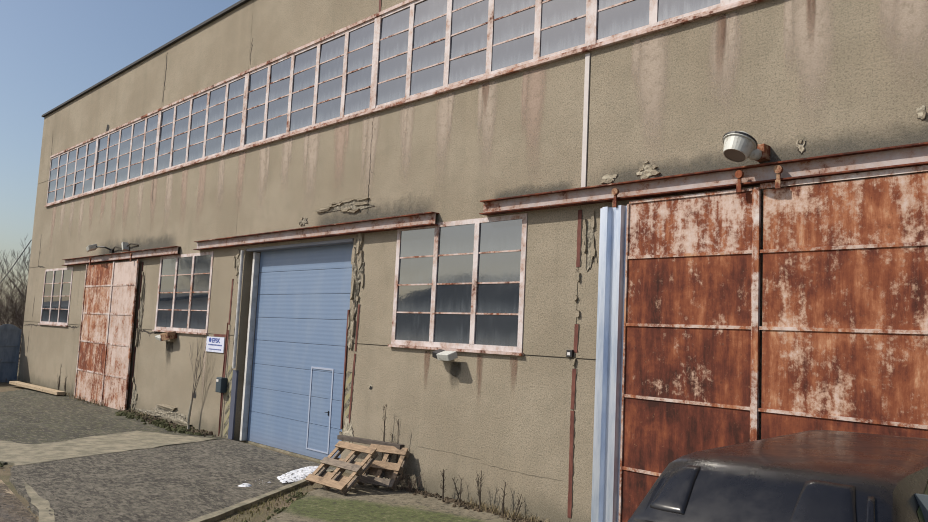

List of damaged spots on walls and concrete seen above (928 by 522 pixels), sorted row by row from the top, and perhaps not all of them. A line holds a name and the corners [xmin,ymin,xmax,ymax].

leakage [632,35,665,122]
leakage [712,12,738,87]
leakage [784,0,830,88]
leakage [304,132,319,184]
leakage [362,115,379,178]
leakage [401,105,413,162]
spalling [636,161,660,179]
spalling [298,197,375,226]
corrosion [574,210,583,282]
spalling [347,233,365,351]
corrosion [130,262,144,404]
corrosion [567,294,580,518]